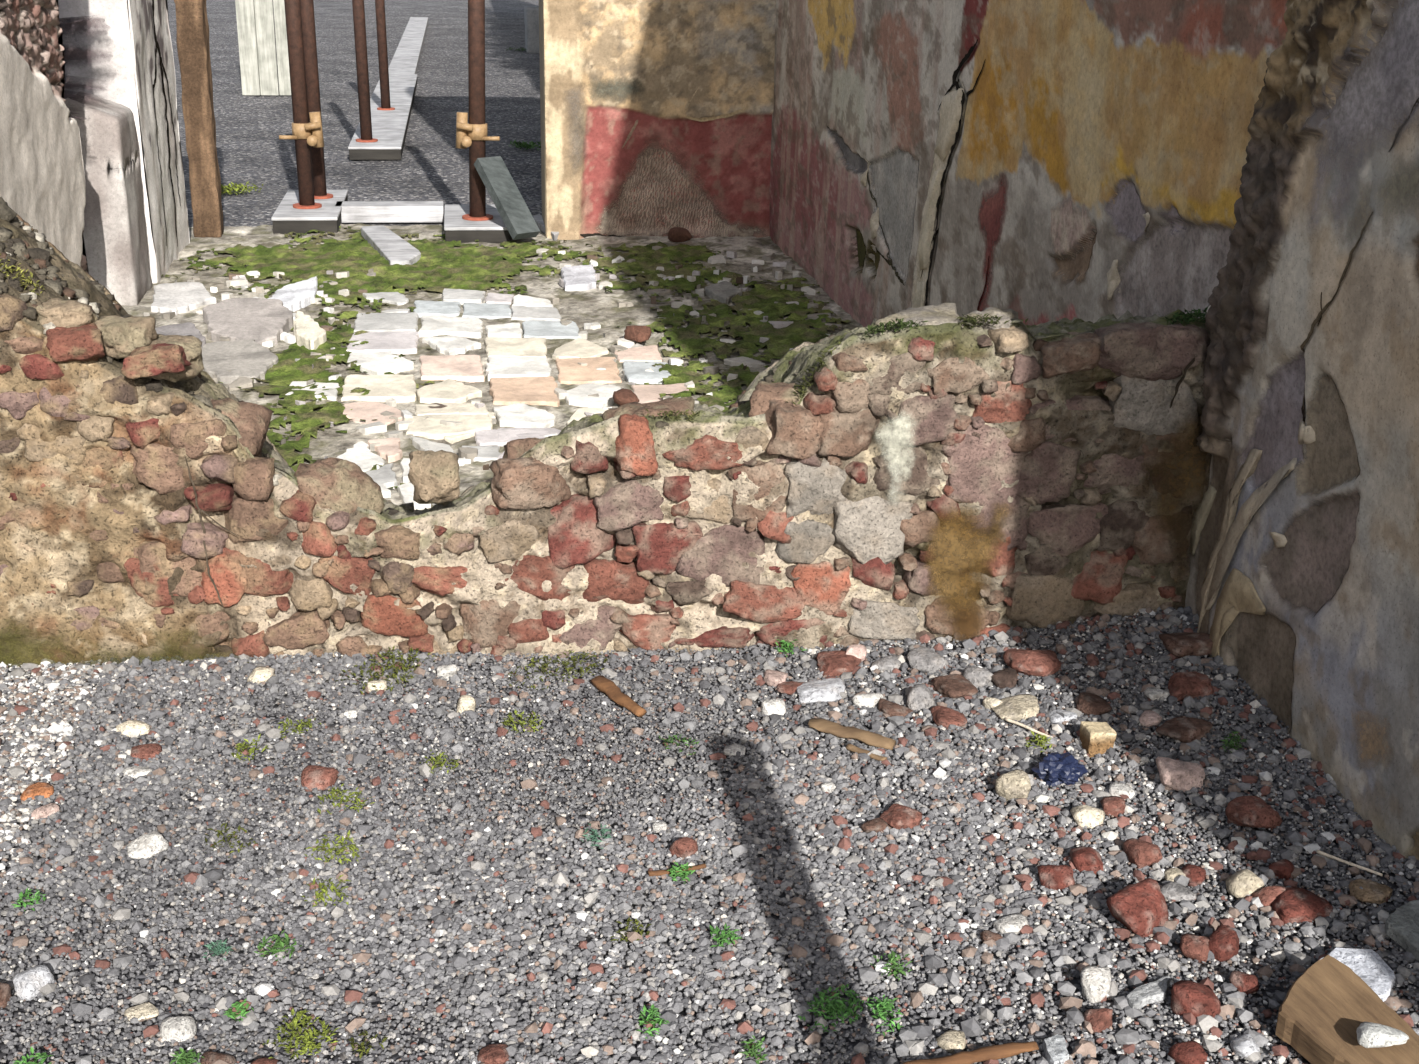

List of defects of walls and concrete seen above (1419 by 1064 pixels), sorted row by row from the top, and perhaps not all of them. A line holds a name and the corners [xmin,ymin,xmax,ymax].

spalling [828,83,967,308]
crack [867,39,986,306]
crack [977,257,989,311]
spalling [1051,180,1232,317]
crack [1300,212,1373,422]
crack [1388,98,1419,152]
water stain [928,507,1008,641]
peeling [1190,355,1360,734]